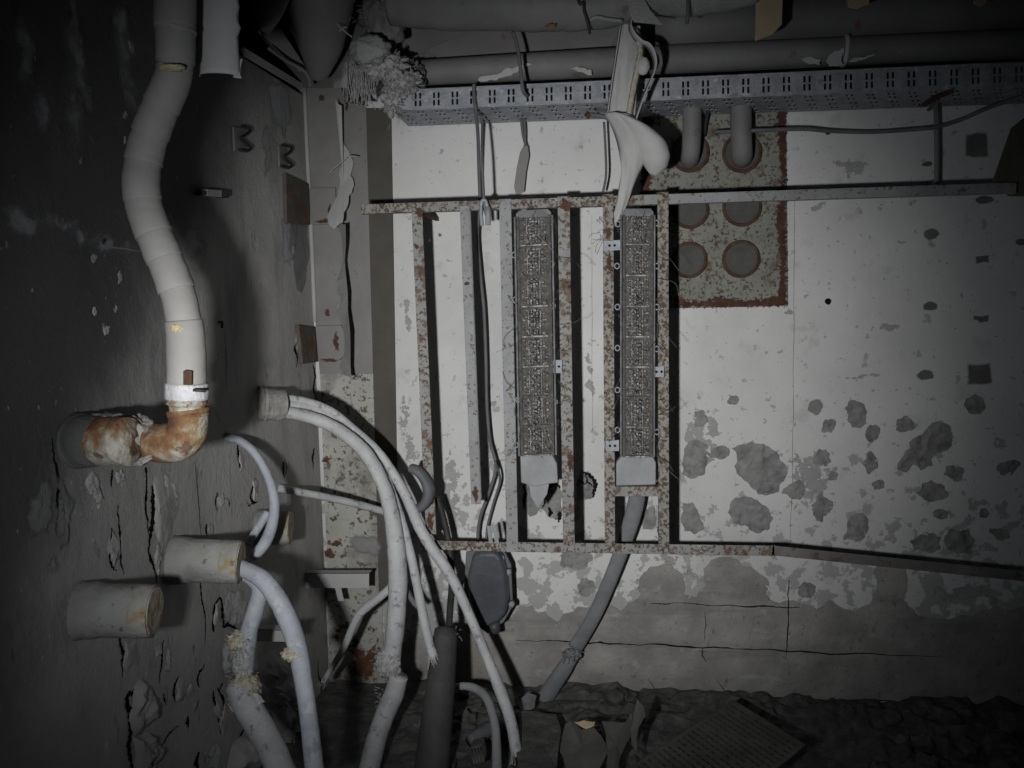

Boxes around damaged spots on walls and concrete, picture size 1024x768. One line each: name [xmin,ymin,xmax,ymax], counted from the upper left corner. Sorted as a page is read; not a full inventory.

rust [639,165,652,208]
rust [674,109,788,309]
crack [26,438,74,549]
crack [107,445,259,582]
rust [324,540,341,558]
spalling [681,410,833,534]
spalling [808,400,884,490]
crack [119,583,247,768]
rust [349,636,380,683]
peeling [401,637,428,680]
crack [517,583,937,660]
peeling [455,553,1024,705]